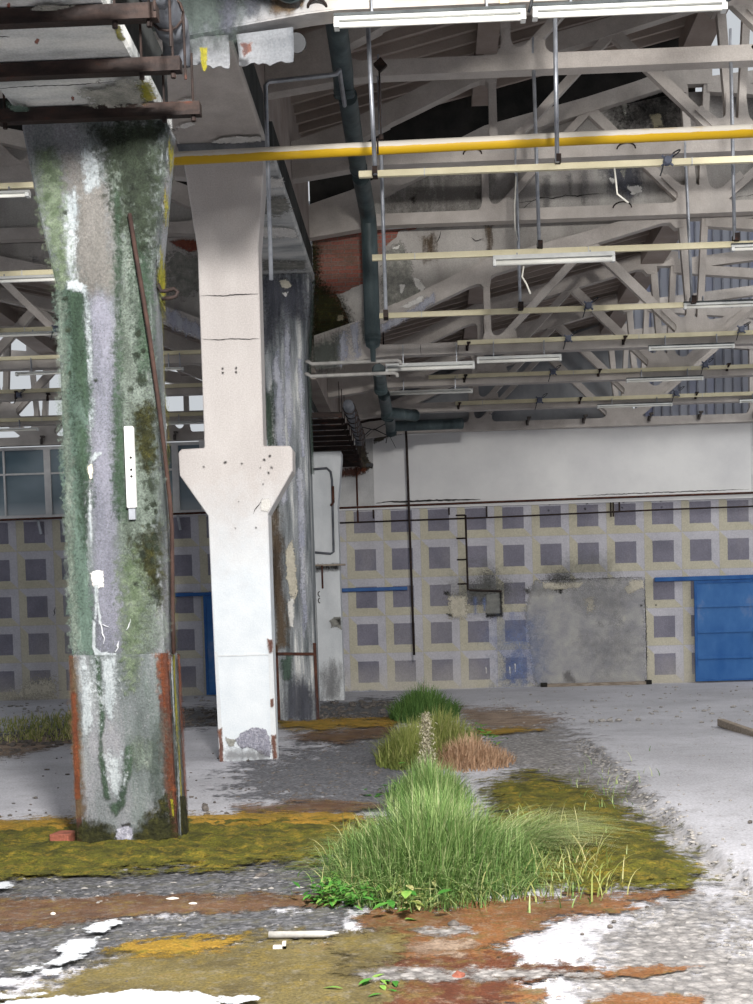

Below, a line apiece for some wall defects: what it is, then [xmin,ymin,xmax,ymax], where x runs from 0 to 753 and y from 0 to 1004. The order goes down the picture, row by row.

damp [34,119,174,735]
damp [262,241,364,457]
damp [281,468,307,637]
corrosion [69,657,86,817]
efflorescence [104,753,129,798]
corrosion [152,654,189,836]
spalling [225,727,271,761]